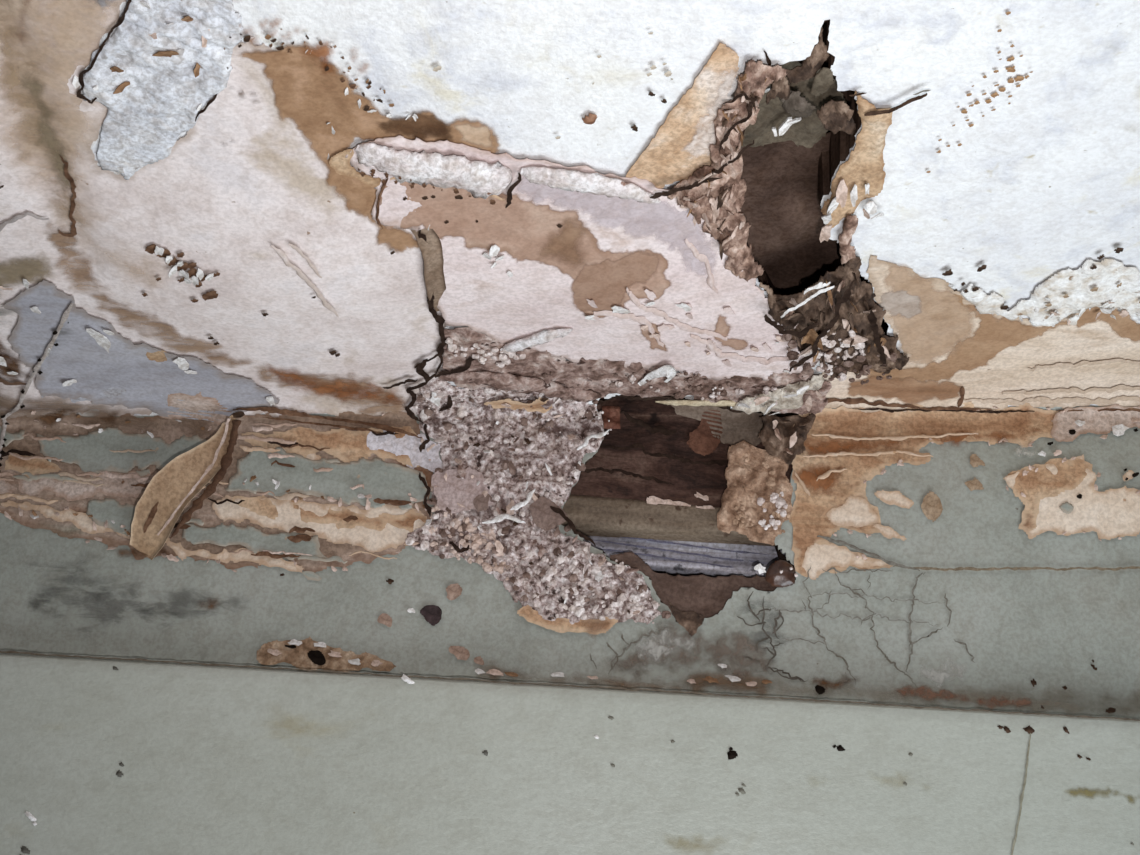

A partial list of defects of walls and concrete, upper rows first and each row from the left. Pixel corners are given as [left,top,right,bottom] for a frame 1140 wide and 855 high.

damp [0,0,405,414]
damp [224,23,499,252]
corrosion [952,44,1033,127]
crack [0,377,27,385]
damp [0,396,149,428]
crack [233,292,475,438]
peeling [0,0,1140,635]
mould [72,590,216,621]
crack [0,535,1140,721]